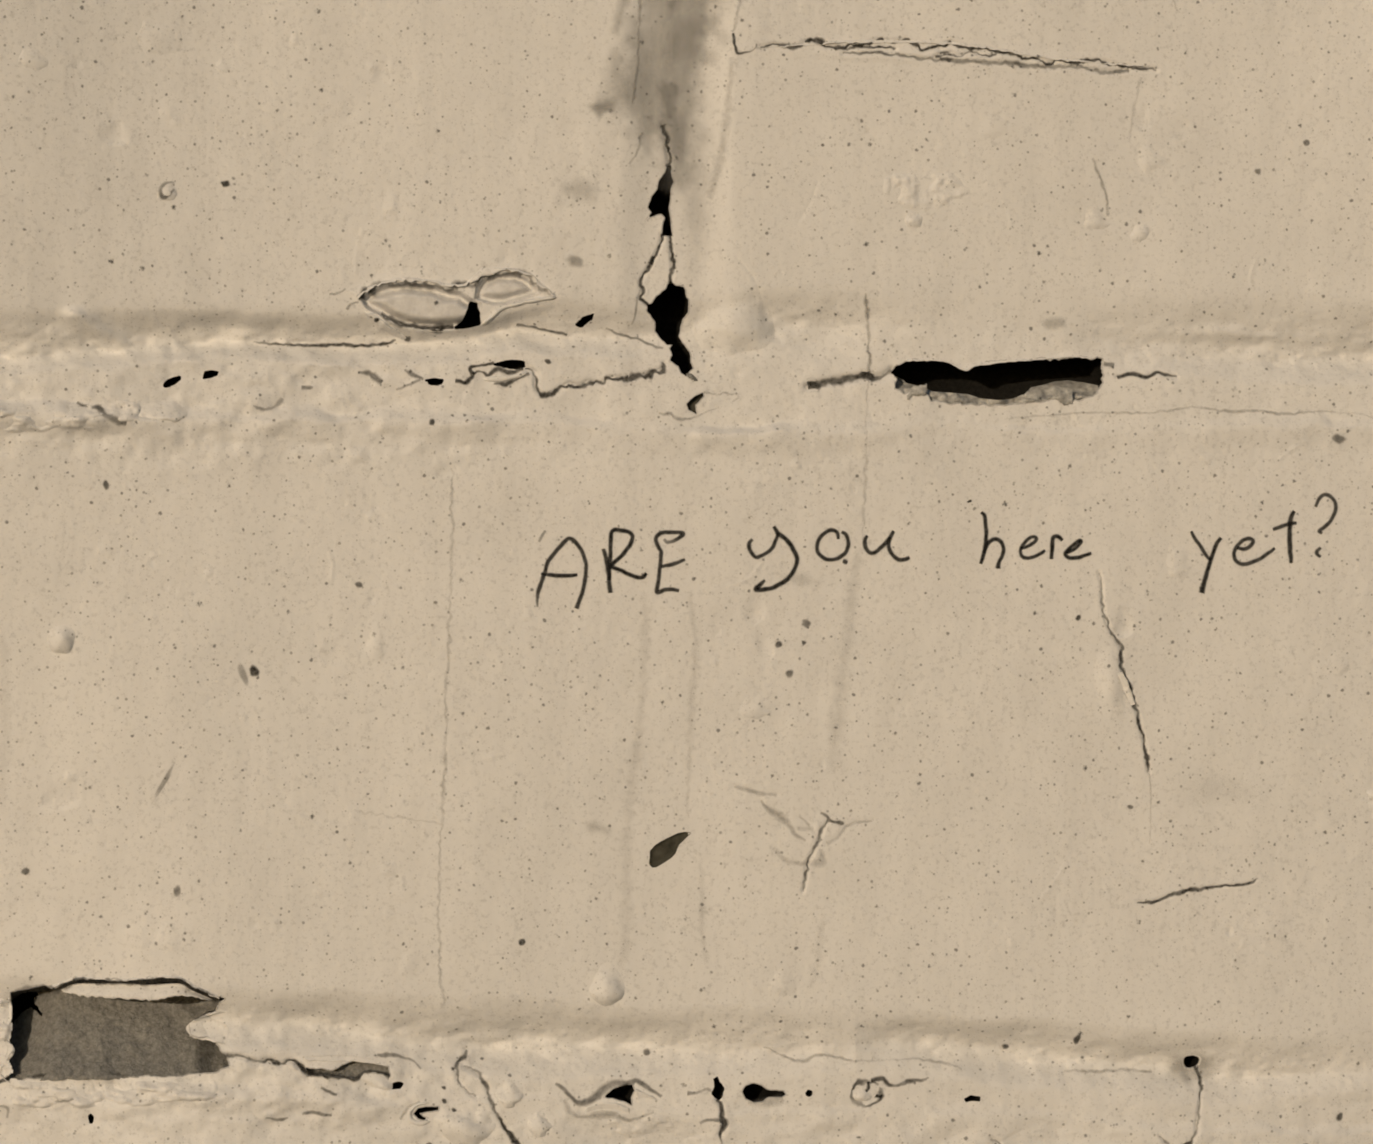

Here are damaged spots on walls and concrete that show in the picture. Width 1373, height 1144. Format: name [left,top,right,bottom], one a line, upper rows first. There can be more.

crack [732,33,1148,73]
crack [525,124,698,398]
crack [517,324,567,336]
spalling [889,355,1104,407]
crack [1103,604,1149,767]
crack [1139,880,1255,904]
spalling [0,975,230,1083]
spalling [305,1059,391,1078]
crack [1194,1066,1203,1100]